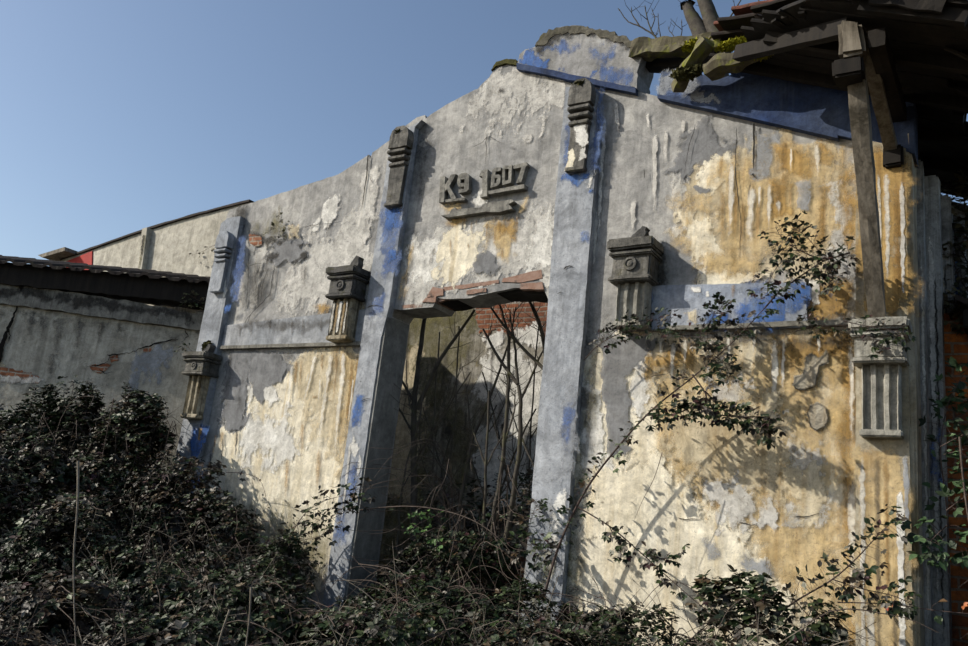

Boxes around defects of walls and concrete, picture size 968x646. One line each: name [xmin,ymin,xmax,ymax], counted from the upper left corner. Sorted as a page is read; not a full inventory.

peeling [561,49,633,193]
peeling [657,69,720,104]
peeling [223,164,554,317]
damp [747,186,780,235]
crack [0,286,24,362]
flaking render [0,362,40,383]
crack [87,328,189,374]
damp [647,341,686,376]
peeling [548,114,856,646]
damp [710,333,785,393]
peeling [180,347,363,595]
damp [848,237,963,646]